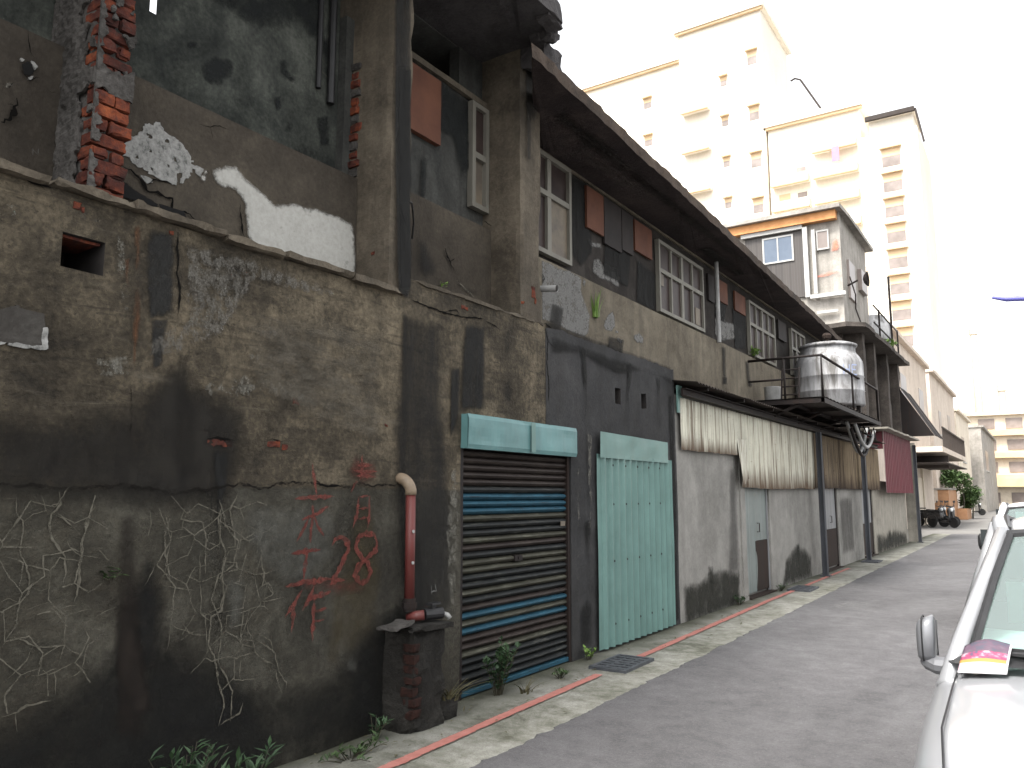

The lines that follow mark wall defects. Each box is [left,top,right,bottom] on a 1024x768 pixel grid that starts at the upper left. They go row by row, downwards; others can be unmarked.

flaking render [51,0,355,272]
flaking render [347,62,362,177]
spalling [0,327,48,350]
crack [176,238,185,313]
flaking render [521,243,619,337]
leakage [547,305,637,393]
crack [0,475,397,729]
leakage [0,318,484,768]
leakage [649,361,740,621]
leakage [784,546,812,585]